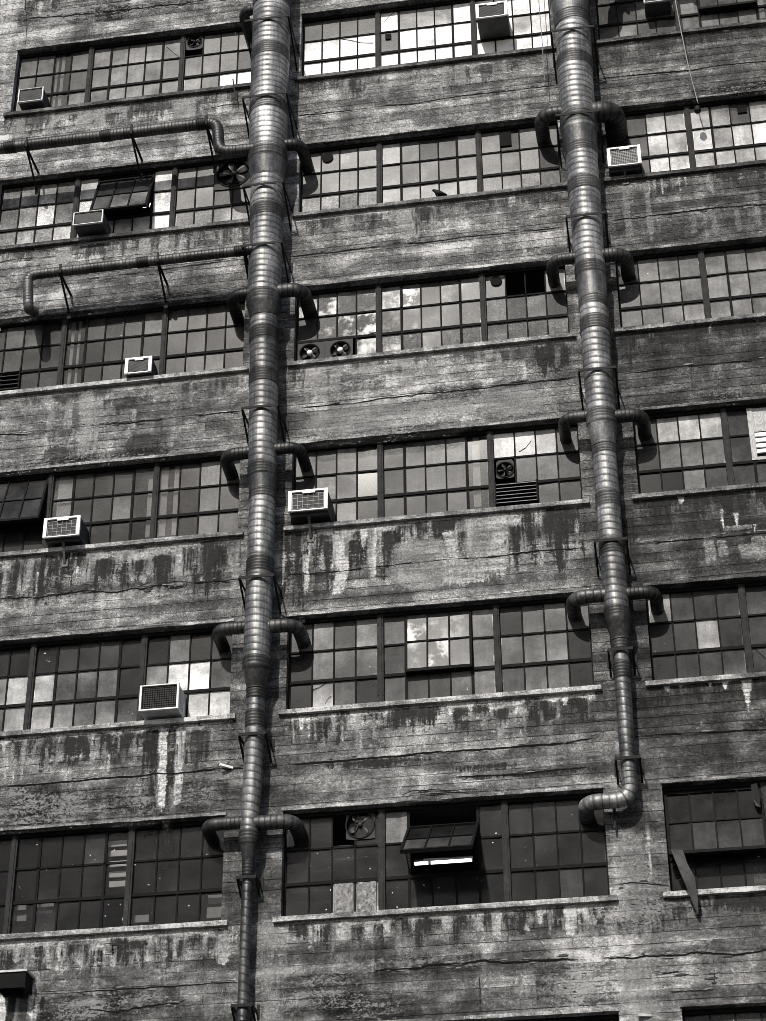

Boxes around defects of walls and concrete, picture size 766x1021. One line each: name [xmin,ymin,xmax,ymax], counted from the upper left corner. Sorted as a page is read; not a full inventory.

damp [0,538,242,618]
damp [283,506,586,623]
damp [286,691,596,769]
damp [0,720,232,863]
damp [456,762,597,781]
damp [288,903,607,950]
damp [0,926,238,1021]
crack [375,953,578,1008]
crack [602,949,766,1000]